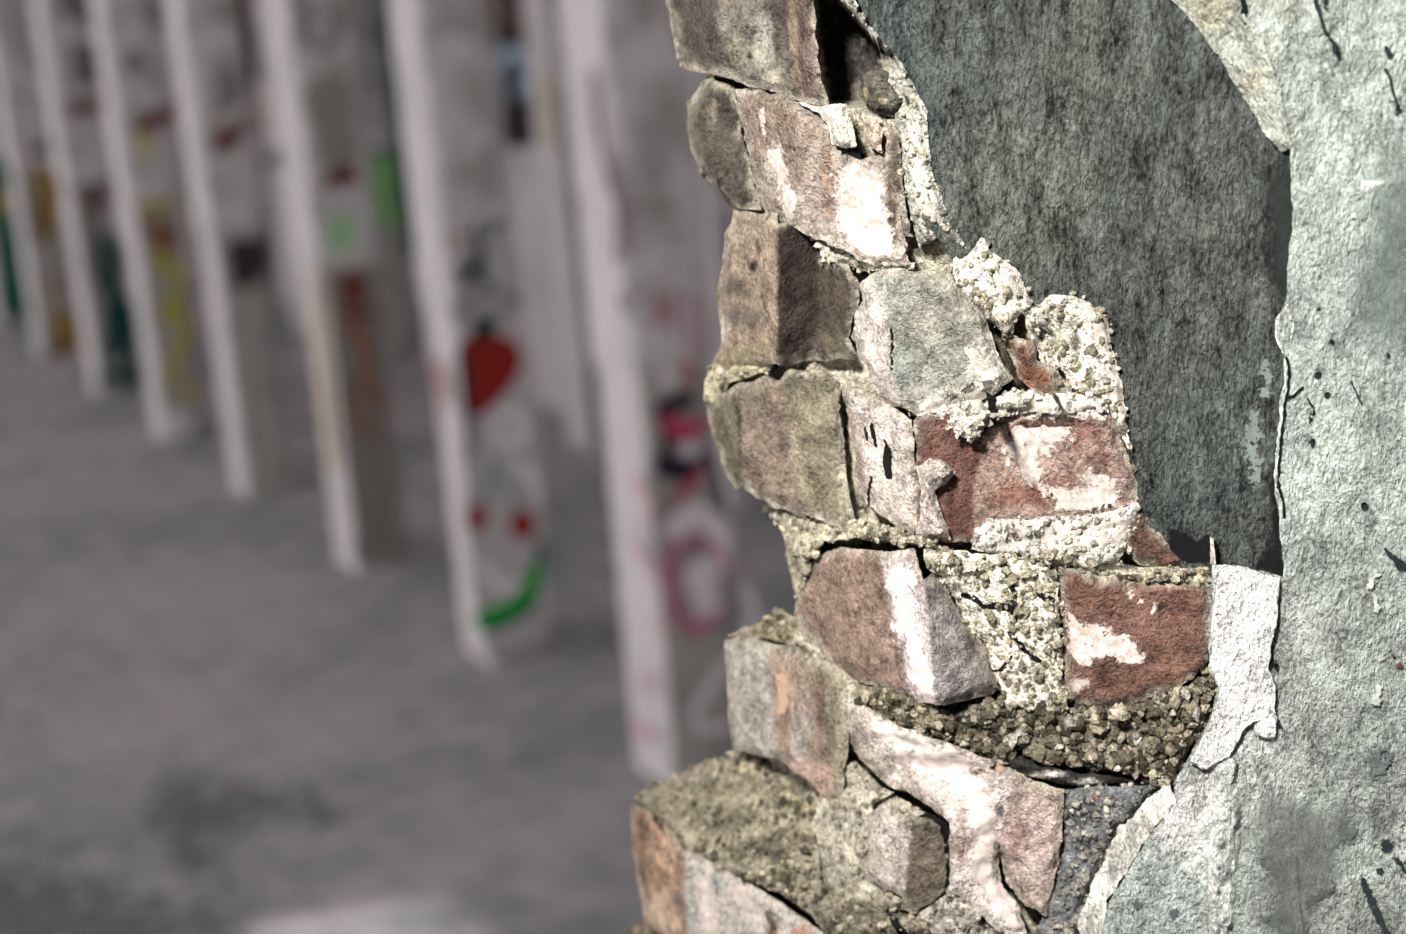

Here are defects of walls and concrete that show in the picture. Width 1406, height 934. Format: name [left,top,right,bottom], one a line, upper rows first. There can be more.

crack [1240,0,1249,26]
spalling [624,0,1294,934]
crack [1384,548,1406,572]